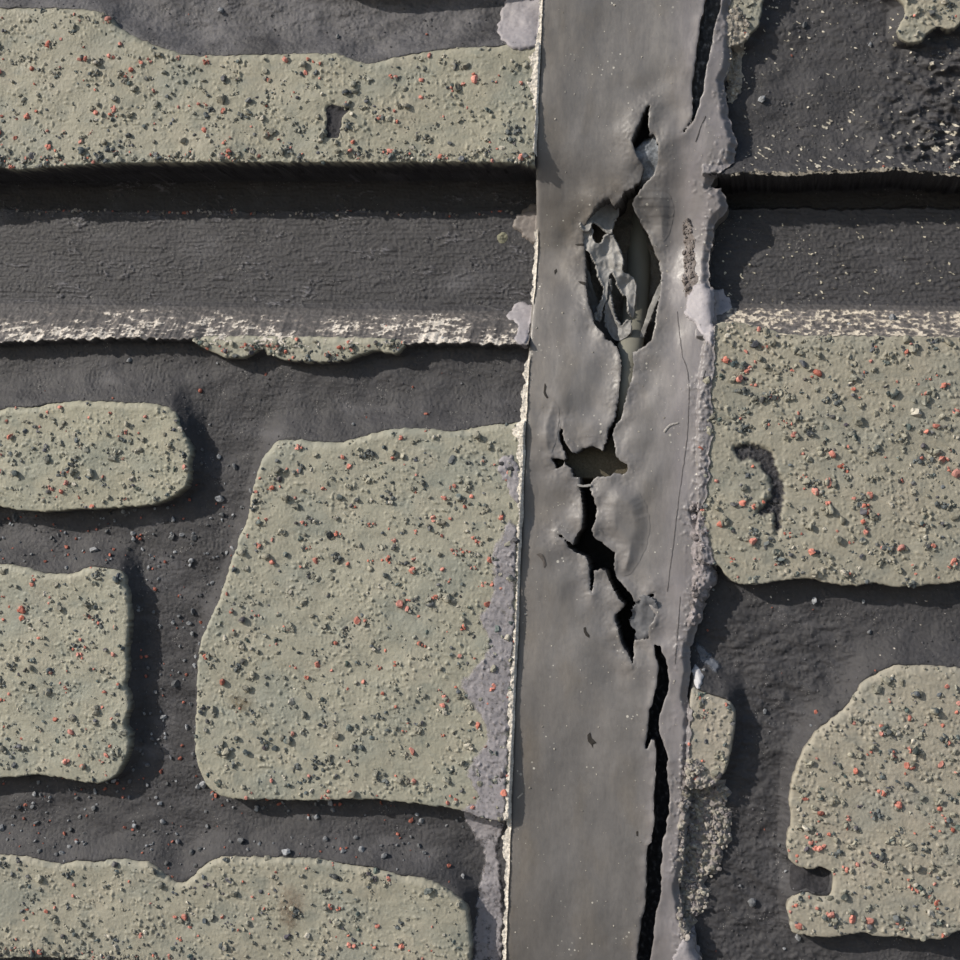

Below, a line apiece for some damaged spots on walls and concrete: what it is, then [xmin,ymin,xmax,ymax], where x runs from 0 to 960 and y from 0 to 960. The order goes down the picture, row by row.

crack [683,0,721,142]
crack [552,105,706,960]
spalling [676,756,732,941]